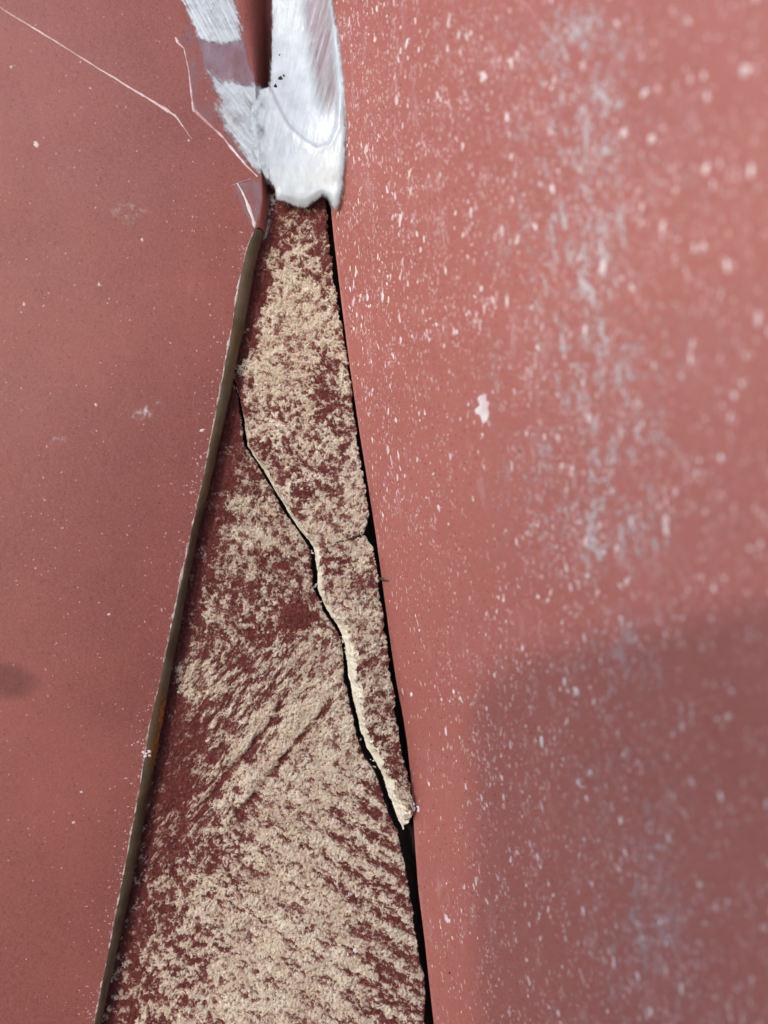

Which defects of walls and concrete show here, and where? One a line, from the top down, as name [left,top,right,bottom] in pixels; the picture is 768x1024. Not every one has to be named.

peeling [102,181,425,1024]
crack [233,380,400,826]